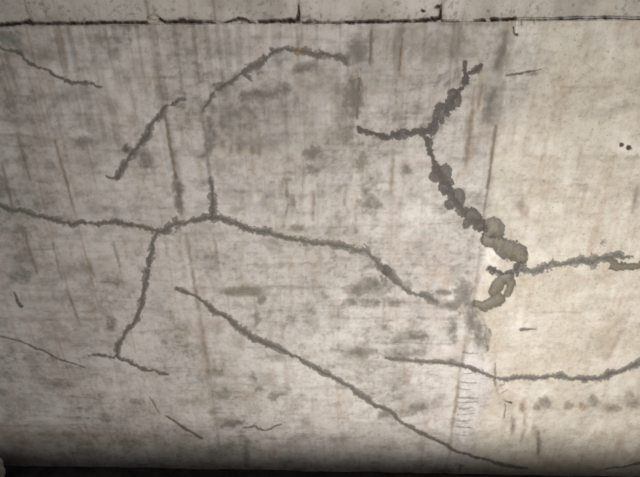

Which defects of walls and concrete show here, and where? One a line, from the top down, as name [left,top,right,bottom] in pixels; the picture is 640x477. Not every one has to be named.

crack [0,46,102,88]
crack [202,46,350,113]
crack [106,98,187,181]
crack [357,60,640,312]
crack [0,177,439,375]
crack [151,399,203,439]
crack [175,287,528,469]
crack [385,356,640,417]